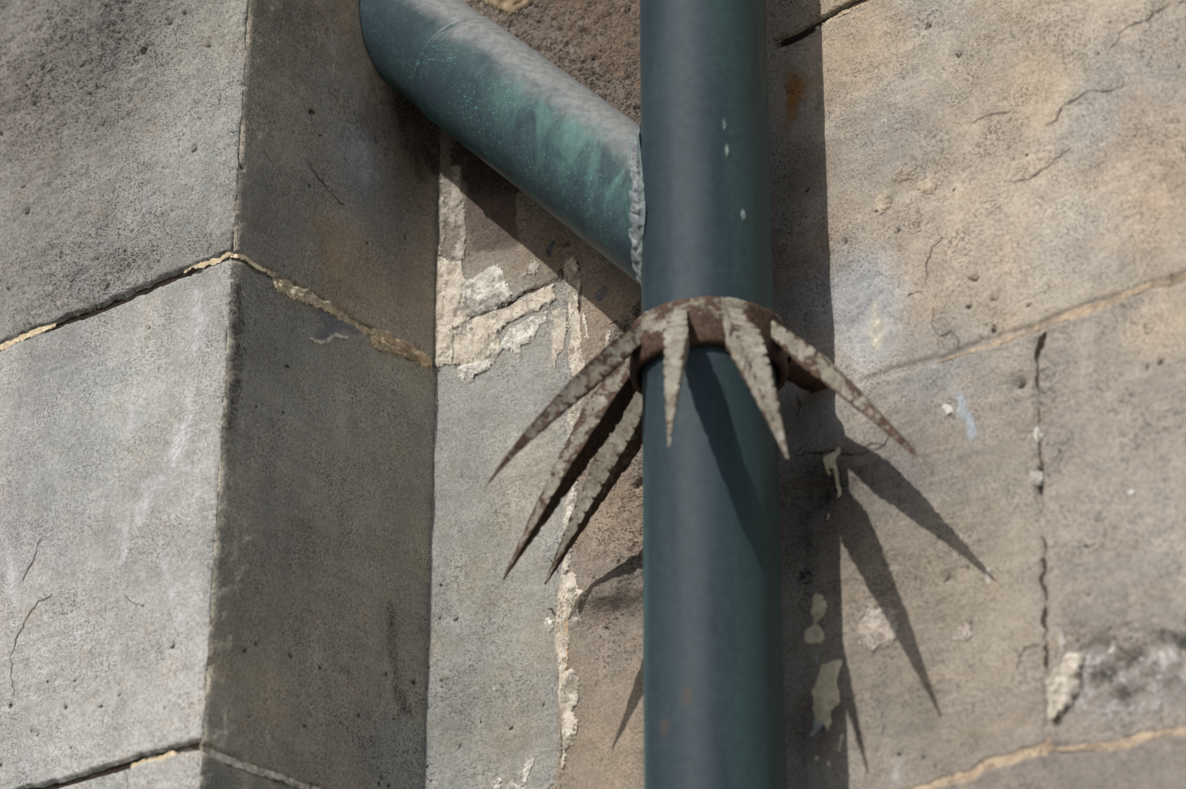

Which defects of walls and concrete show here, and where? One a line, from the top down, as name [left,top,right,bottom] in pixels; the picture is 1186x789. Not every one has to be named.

crack [1111,0,1186,47]
crack [1044,86,1123,125]
flaking render [368,165,590,386]
spalling [273,278,353,345]
crack [1034,331,1046,501]
flaking render [562,481,578,531]
crack [10,540,53,696]
peeling [804,593,828,645]
crack [1016,537,1049,679]
flaking render [544,549,587,773]
peeling [811,660,843,730]
crack [852,710,884,746]